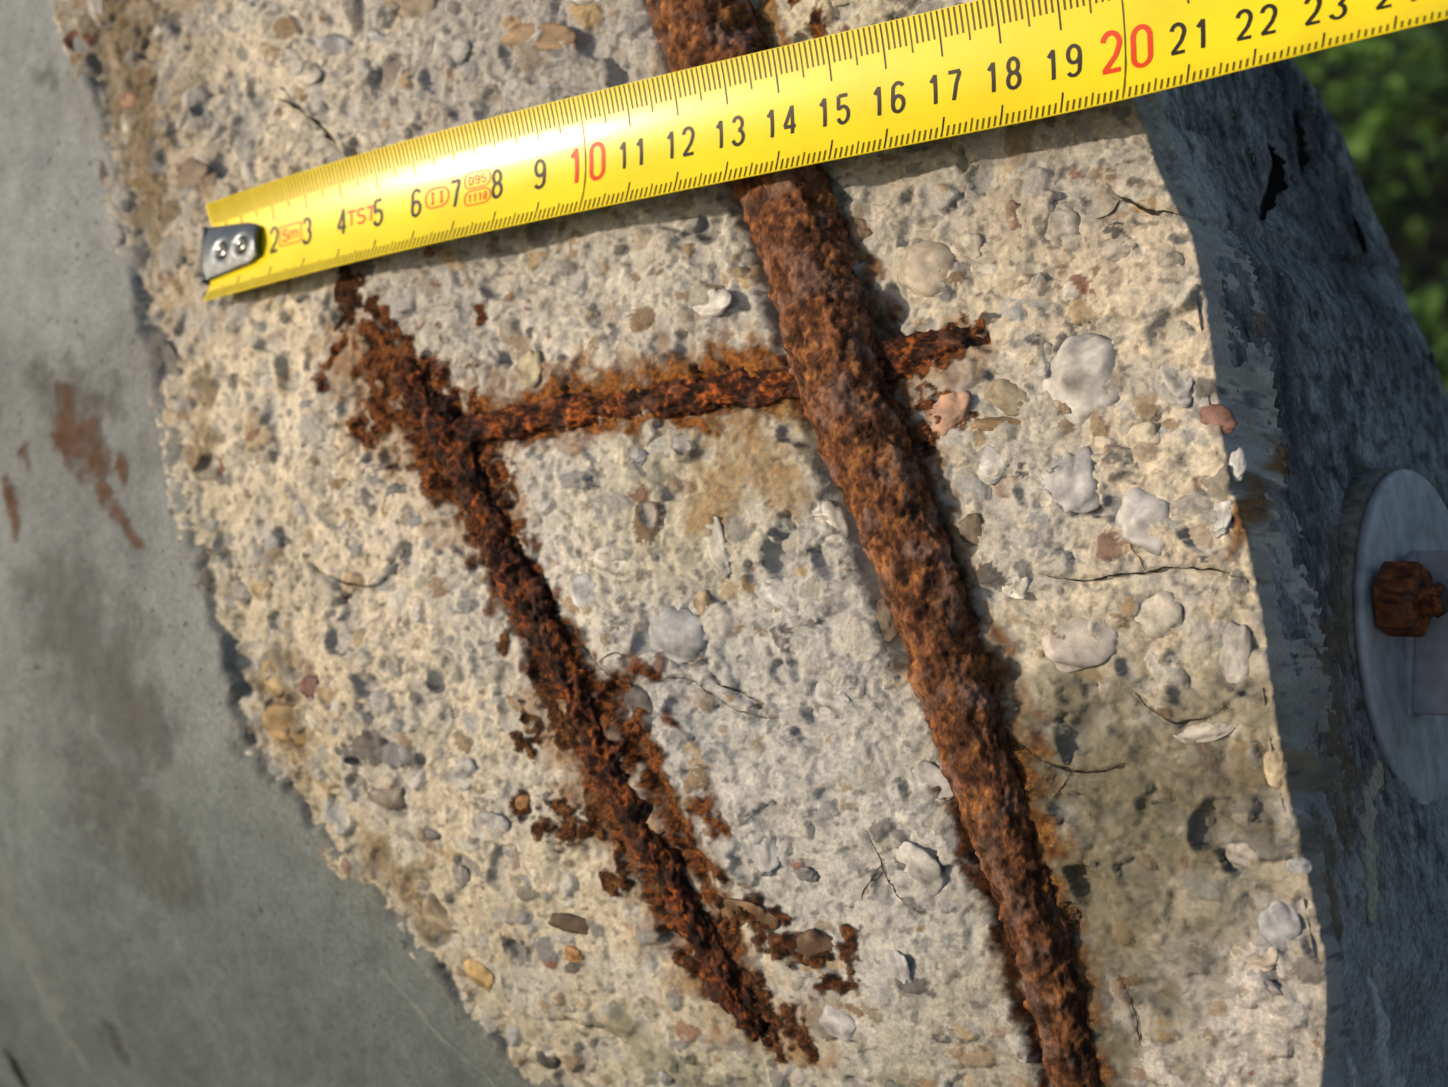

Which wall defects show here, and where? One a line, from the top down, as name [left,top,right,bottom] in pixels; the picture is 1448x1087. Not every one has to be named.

rust [755,0,828,50]
crack [1095,183,1178,219]
crack [1260,112,1310,221]
rust [844,218,902,338]
rust [3,477,19,541]
rust [53,386,143,547]
spalling [52,0,1053,1087]
spalling [819,95,1385,1087]
rust [891,312,1114,1087]